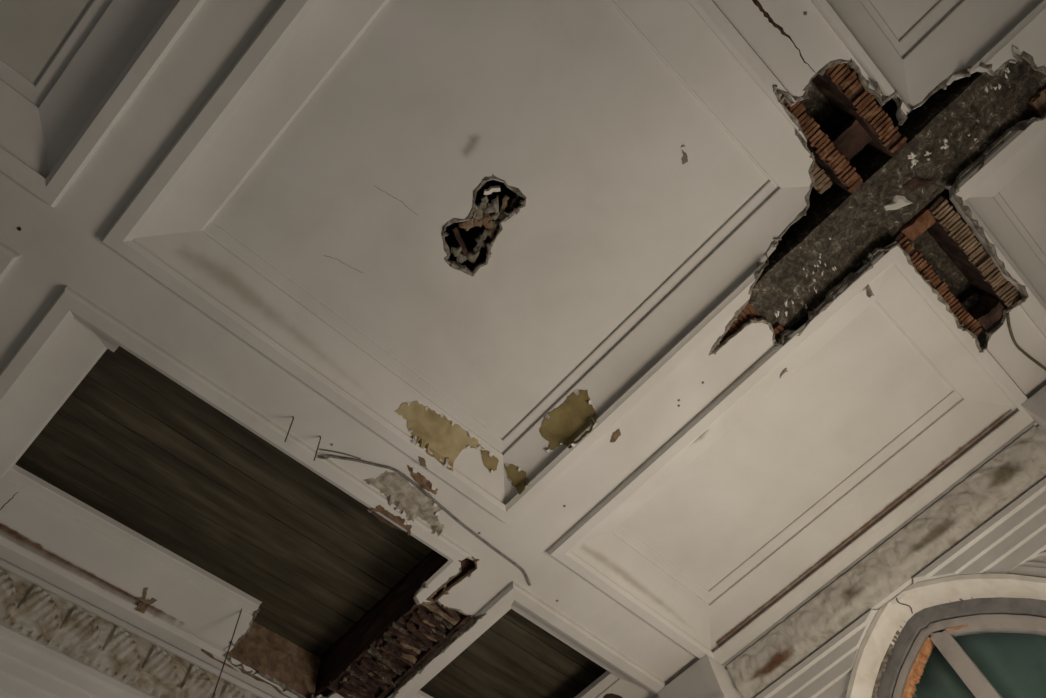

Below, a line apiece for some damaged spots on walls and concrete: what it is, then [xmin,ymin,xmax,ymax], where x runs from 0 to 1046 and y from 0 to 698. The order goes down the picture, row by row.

crack [752,0,816,73]
flaking render [441,174,527,277]
peeling [540,390,597,453]
peeling [363,401,528,537]
damp [916,525,945,549]
flaking render [426,556,480,602]